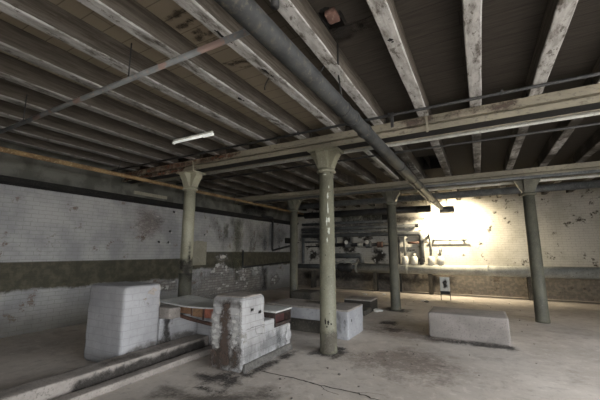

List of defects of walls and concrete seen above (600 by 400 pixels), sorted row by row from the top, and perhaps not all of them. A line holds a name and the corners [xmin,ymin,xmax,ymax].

crack [263,371,381,400]